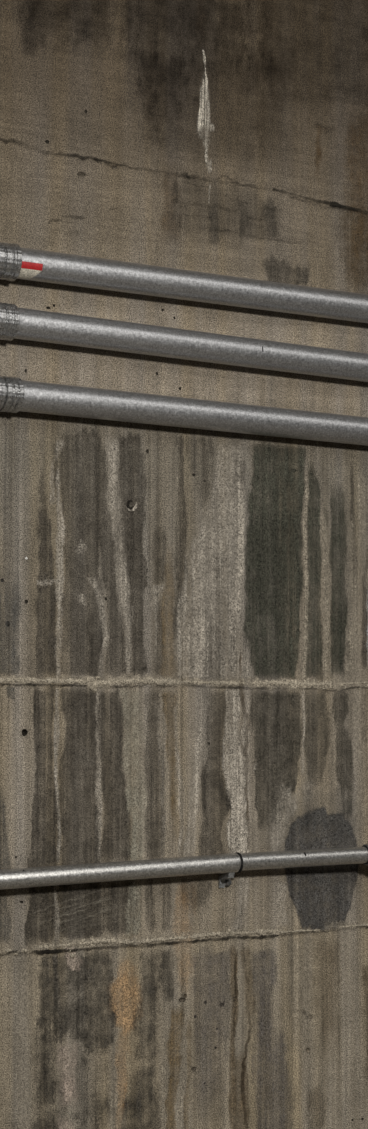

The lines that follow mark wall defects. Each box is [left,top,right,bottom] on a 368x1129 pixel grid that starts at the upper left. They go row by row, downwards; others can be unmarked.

crack [71,154,111,163]
crack [318,200,359,211]
water stain [36,433,159,674]
water stain [162,445,368,678]
water stain [28,689,165,868]
water stain [178,688,364,855]
water stain [25,882,166,1129]
water stain [135,952,173,1052]